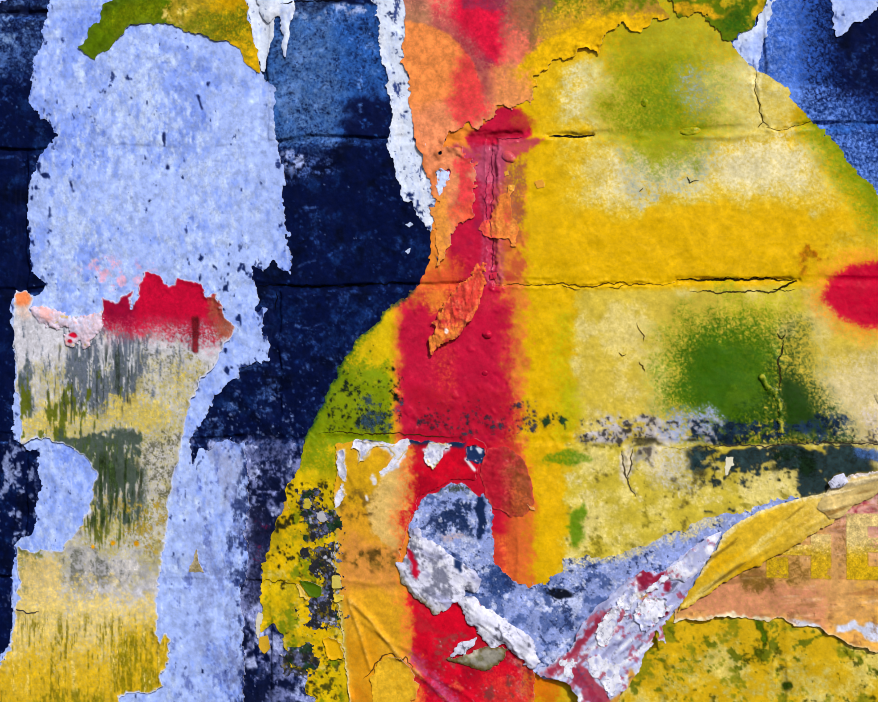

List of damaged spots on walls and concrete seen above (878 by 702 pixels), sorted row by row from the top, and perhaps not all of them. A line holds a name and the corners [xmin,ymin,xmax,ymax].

crack [754,74,813,131]
crack [552,132,594,140]
peeling [436,168,450,196]
peeling [479,170,519,247]
crack [485,137,797,294]
peeling [428,262,498,355]
crack [777,333,785,387]
peeling [724,457,734,475]